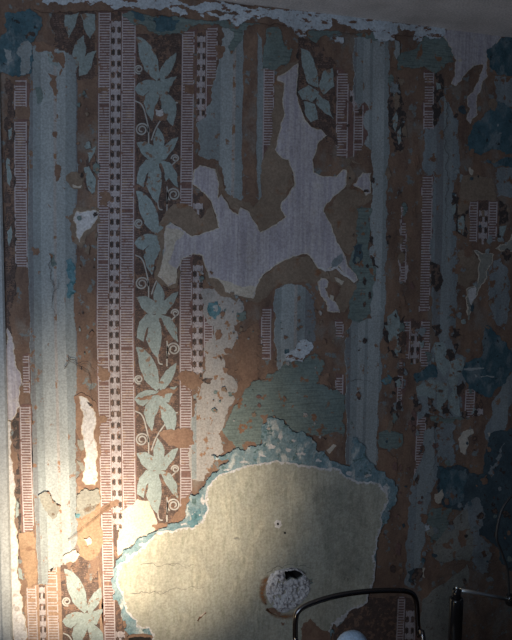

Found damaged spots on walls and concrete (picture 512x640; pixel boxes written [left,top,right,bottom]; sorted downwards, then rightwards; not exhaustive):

peeling [32,0,501,123]
flaking render [164,65,379,316]
peeling [284,339,314,366]
flaking render [75,397,101,519]
spalling [266,567,313,625]